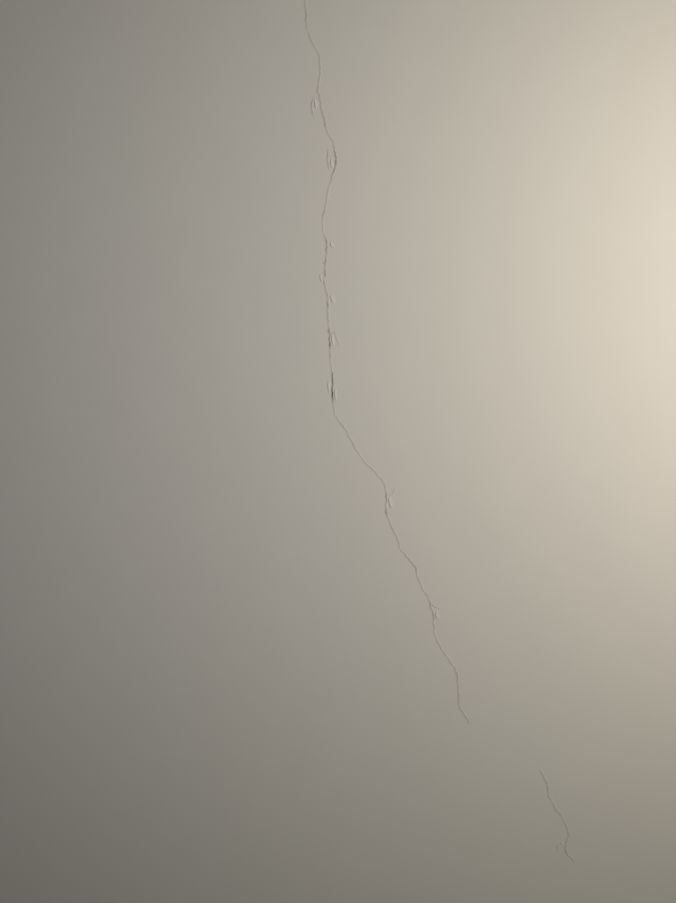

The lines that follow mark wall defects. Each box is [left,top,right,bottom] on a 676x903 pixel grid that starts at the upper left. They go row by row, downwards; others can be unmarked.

crack [304,0,470,724]